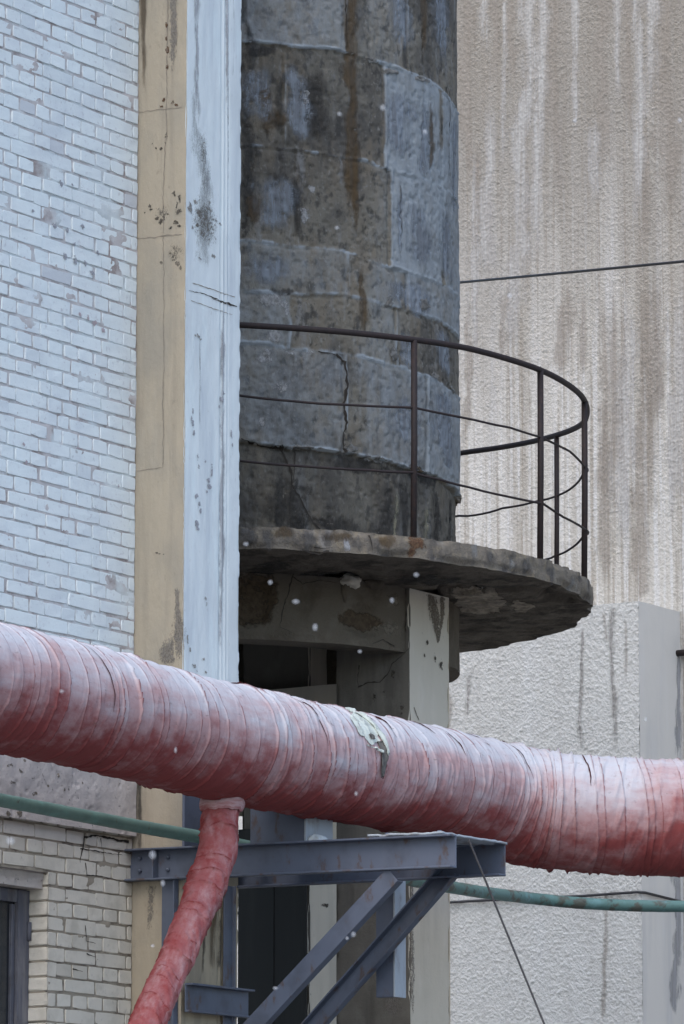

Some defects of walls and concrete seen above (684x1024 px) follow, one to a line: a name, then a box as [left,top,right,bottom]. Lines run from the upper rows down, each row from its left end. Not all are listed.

corrosion [344,0,361,224]
damp [633,0,660,188]
damp [472,0,548,340]
crack [191,283,237,315]
corrosion [359,275,367,330]
crack [318,351,349,452]
damp [160,590,185,664]
spalling [238,573,399,636]
spalling [424,586,536,670]
crack [80,835,129,883]